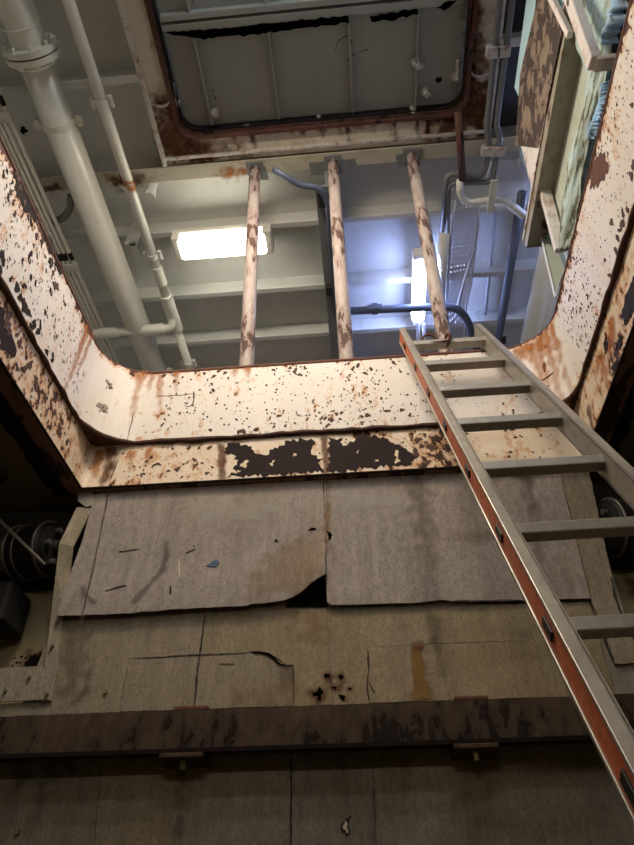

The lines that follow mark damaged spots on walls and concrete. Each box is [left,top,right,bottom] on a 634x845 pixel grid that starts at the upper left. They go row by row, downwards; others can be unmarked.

corrosion [152,97,230,164]
corrosion [223,167,247,179]
peeling [581,150,634,263]
peeling [559,245,602,352]
corrosion [597,317,614,386]
peeling [603,276,634,372]
peeling [123,358,444,481]
hole [312,673,352,701]
corrosion [412,643,430,702]